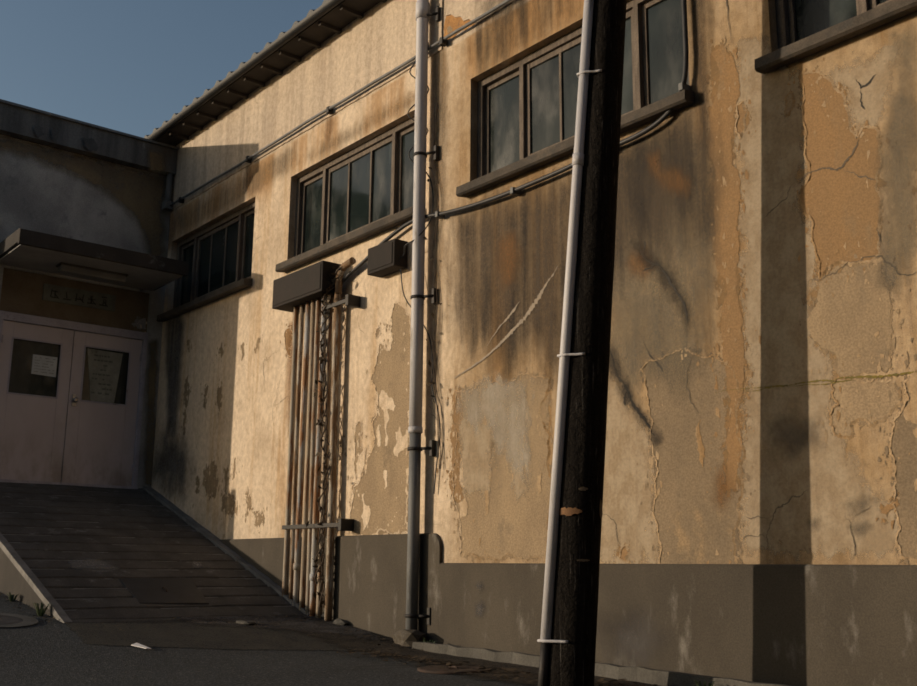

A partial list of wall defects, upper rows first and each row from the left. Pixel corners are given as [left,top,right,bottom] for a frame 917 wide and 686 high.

flaking render [444,15,474,39]
water stain [689,0,705,121]
water stain [610,116,714,387]
peeling [787,57,917,565]
water stain [145,316,186,494]
peeling [179,375,223,439]
peeling [339,298,411,536]
crack [719,371,917,392]
peeling [193,457,267,527]